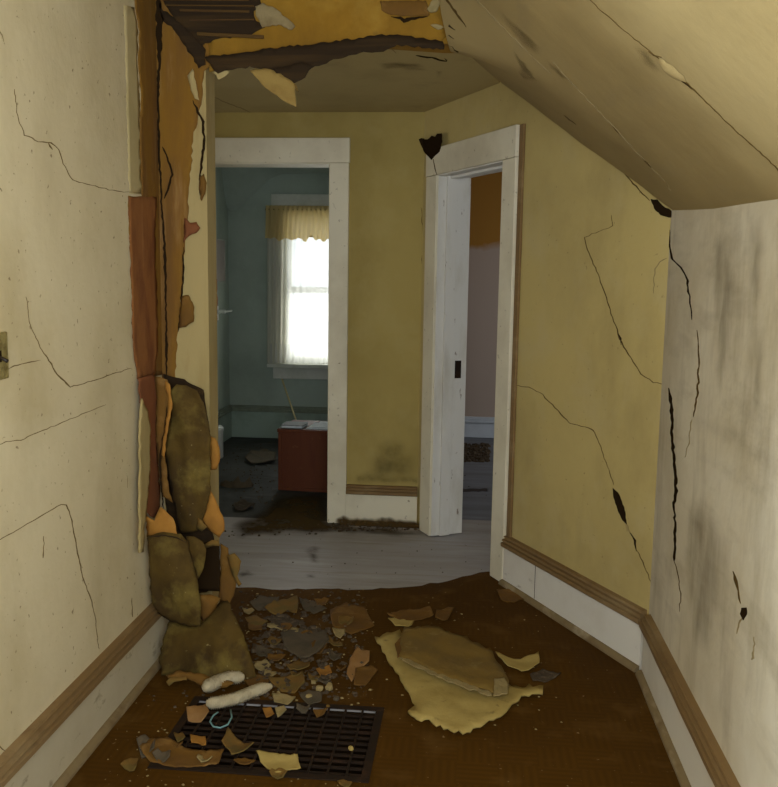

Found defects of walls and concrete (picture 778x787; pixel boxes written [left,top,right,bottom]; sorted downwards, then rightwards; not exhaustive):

spalling [159,0,265,100]
crack [590,0,662,59]
crack [14,89,140,193]
crack [681,81,778,170]
peeling [183,217,200,243]
peeling [199,174,207,201]
crack [9,298,131,387]
peeling [179,295,194,328]
crack [2,405,104,444]
crack [584,215,700,612]
crack [0,504,99,648]
hole [195,542,221,591]